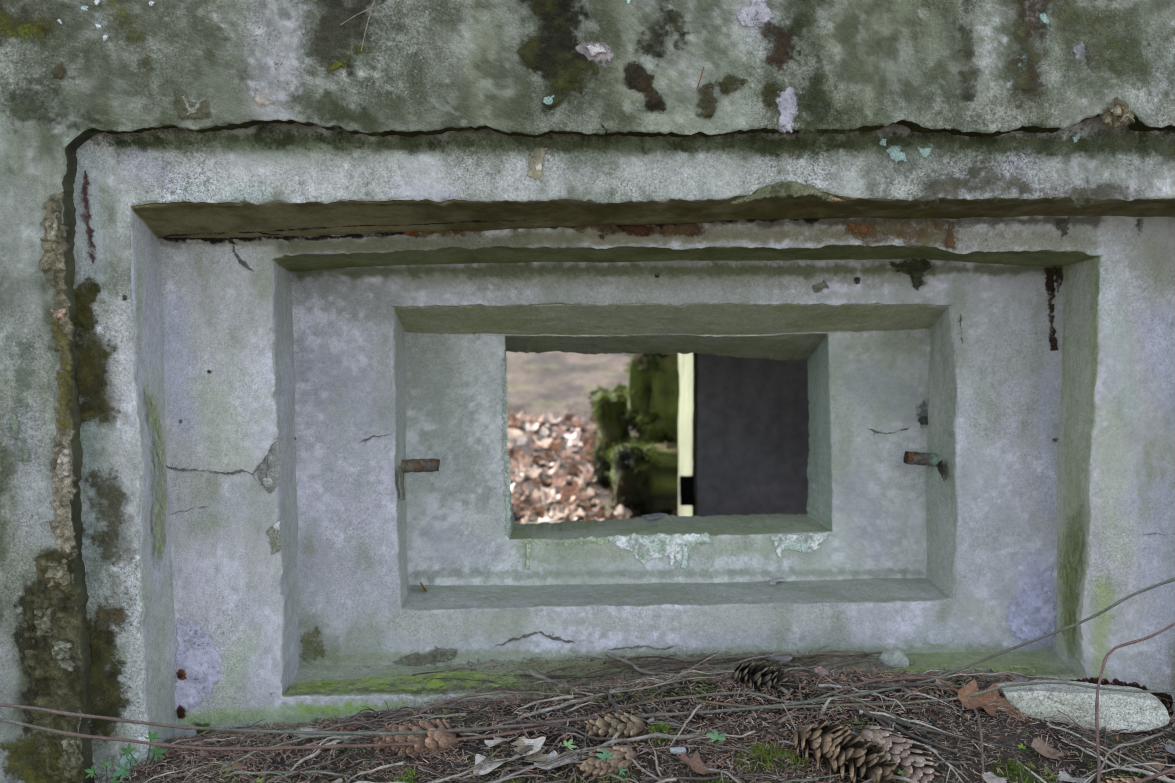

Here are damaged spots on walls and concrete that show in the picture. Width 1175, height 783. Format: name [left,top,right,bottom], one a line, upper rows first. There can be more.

spalling [1103,97,1135,128]
crack [159,219,574,272]
rust [576,223,704,237]
crack [710,217,819,225]
rust [842,218,960,249]
rust [1044,266,1063,351]
crack [166,445,272,481]
spalling [257,438,280,493]